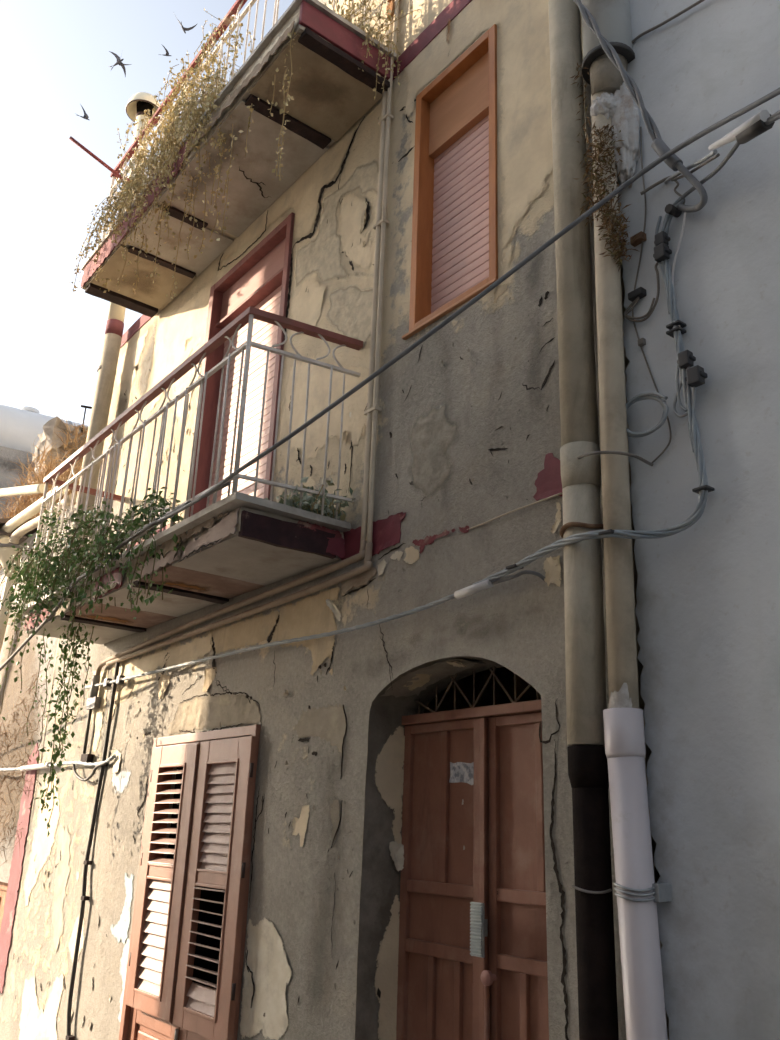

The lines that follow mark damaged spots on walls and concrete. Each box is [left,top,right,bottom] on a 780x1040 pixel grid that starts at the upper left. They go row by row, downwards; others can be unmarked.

crack [218,168,270,271]
crack [284,116,365,340]
peeling [526,453,563,534]
peeling [543,555,562,587]
peeling [91,510,469,794]
peeling [19,775,84,963]
peeling [374,726,405,872]
crack [539,701,569,1040]
peeling [15,973,91,1040]
peeling [98,873,134,1022]
peeling [240,918,299,1040]
peeling [374,895,400,1040]